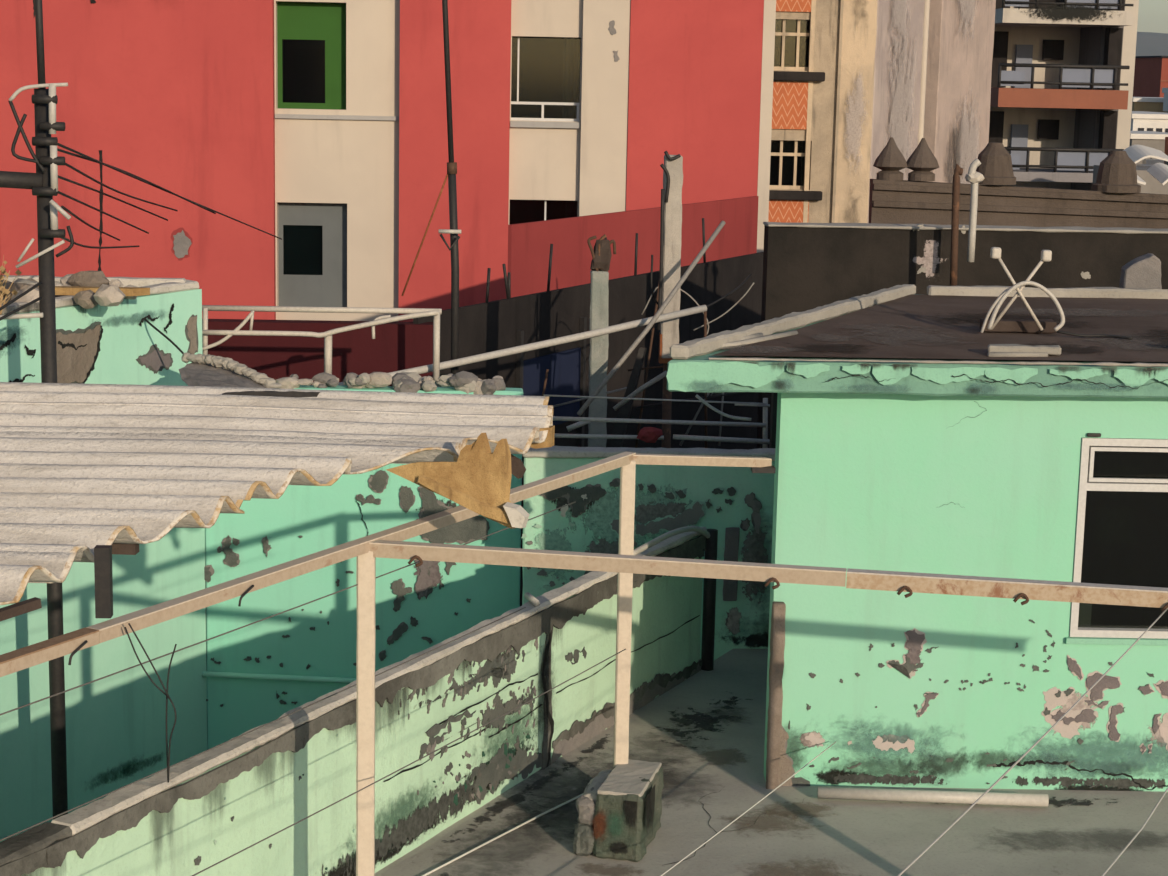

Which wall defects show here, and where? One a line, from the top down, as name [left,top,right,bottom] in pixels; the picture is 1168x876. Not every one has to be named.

damp [889,0,916,179]
damp [951,103,979,184]
spalling [56,321,103,384]
peeling [666,361,1168,392]
peeling [521,478,620,554]
peeling [634,483,770,563]
peeling [375,560,618,806]
crack [384,615,700,782]
damp [98,757,161,783]
peeling [0,699,357,876]
damp [786,725,963,785]
damp [978,740,1168,807]